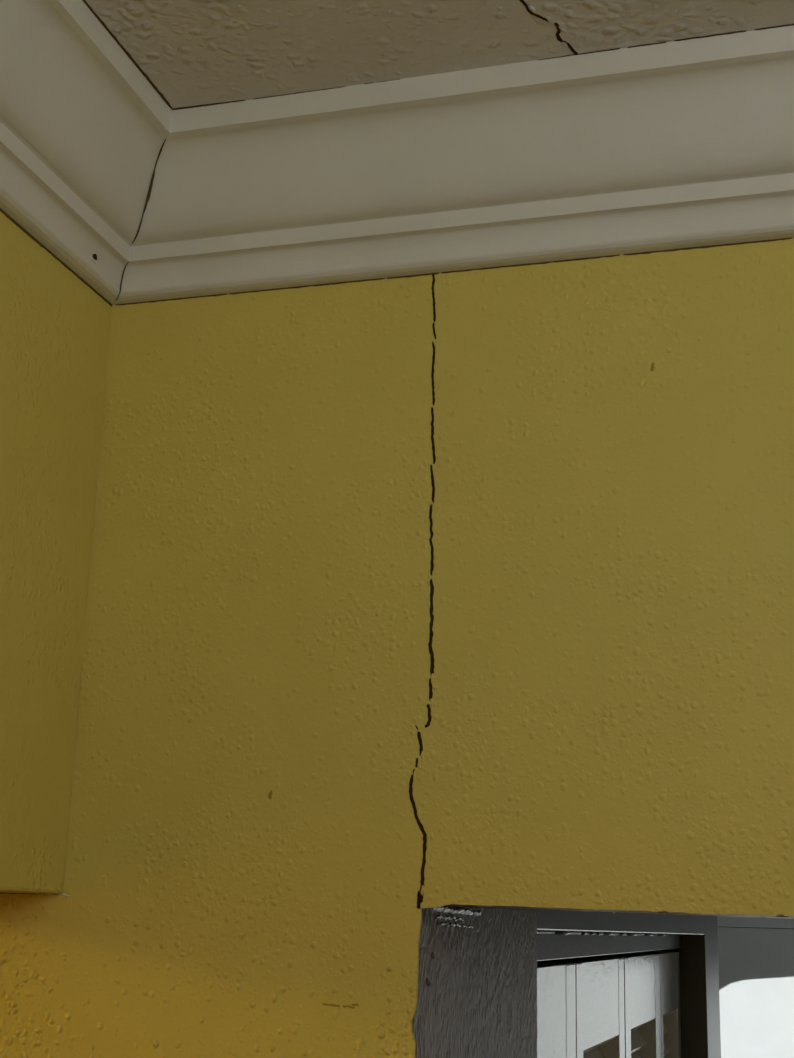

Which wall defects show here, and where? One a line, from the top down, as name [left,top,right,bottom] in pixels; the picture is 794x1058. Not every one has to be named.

crack [519,0,578,55]
crack [116,139,166,300]
crack [409,275,439,905]